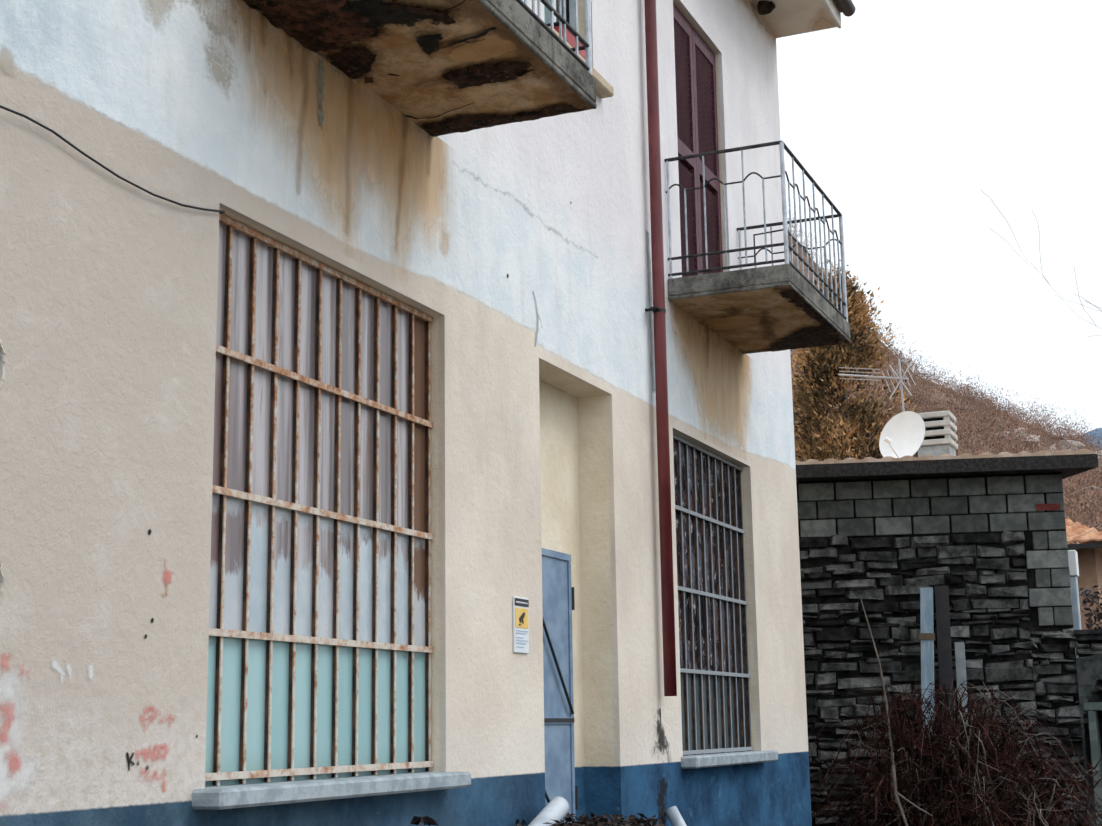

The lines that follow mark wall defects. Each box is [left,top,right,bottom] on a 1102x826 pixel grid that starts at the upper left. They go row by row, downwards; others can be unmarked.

spalling [415,61,534,89]
spalling [417,105,585,137]
peeling [1076,653,1102,723]
water stain [654,708,669,760]
water stain [657,778,668,826]